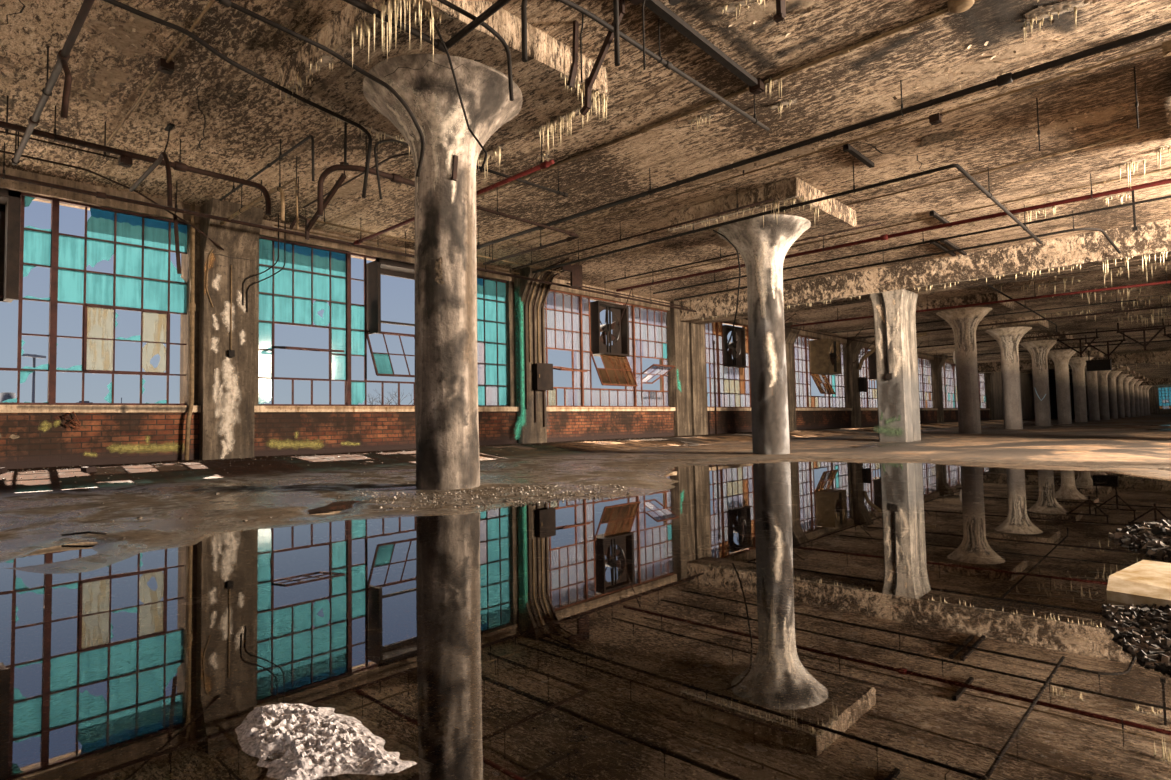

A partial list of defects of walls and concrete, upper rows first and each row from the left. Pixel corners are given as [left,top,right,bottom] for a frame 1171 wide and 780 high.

damp [951,0,1077,48]
damp [386,69,505,324]
damp [416,333,479,488]
damp [754,219,796,452]